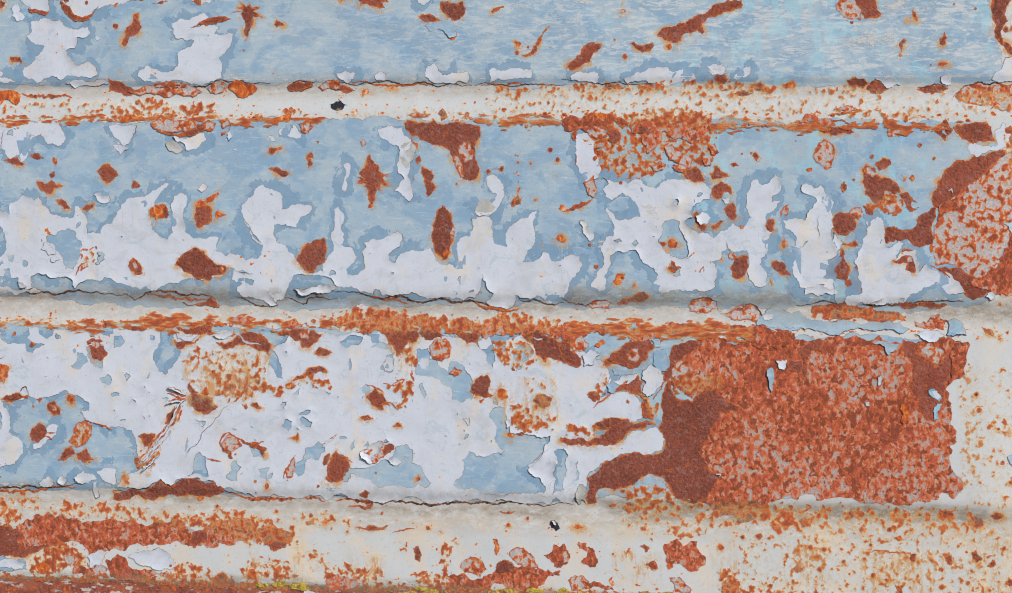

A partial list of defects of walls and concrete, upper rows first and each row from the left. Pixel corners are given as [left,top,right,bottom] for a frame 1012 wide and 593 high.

peeling [0,0,270,104]
peeling [411,0,433,12]
rust [564,42,602,71]
rust [622,0,743,59]
rust [990,0,1012,57]
rust [0,97,339,141]
rust [397,74,1012,306]
rust [175,247,230,283]
peeling [0,119,966,355]
peeling [0,326,665,515]
rust [0,302,1012,593]